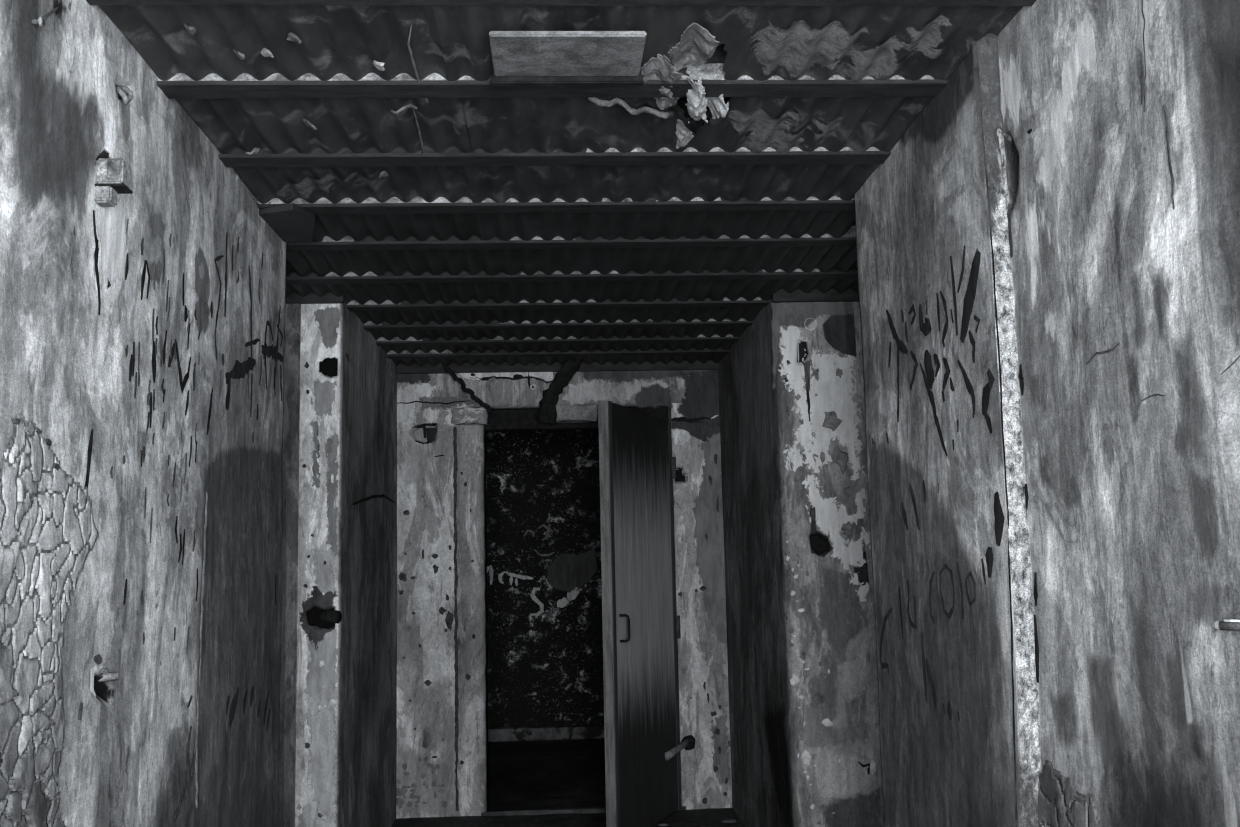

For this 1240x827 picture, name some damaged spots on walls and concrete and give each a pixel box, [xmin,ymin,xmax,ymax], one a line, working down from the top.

crack [84,429,93,489]
peeling [297,306,342,827]
peeling [778,325,872,613]
peeling [790,627,830,824]